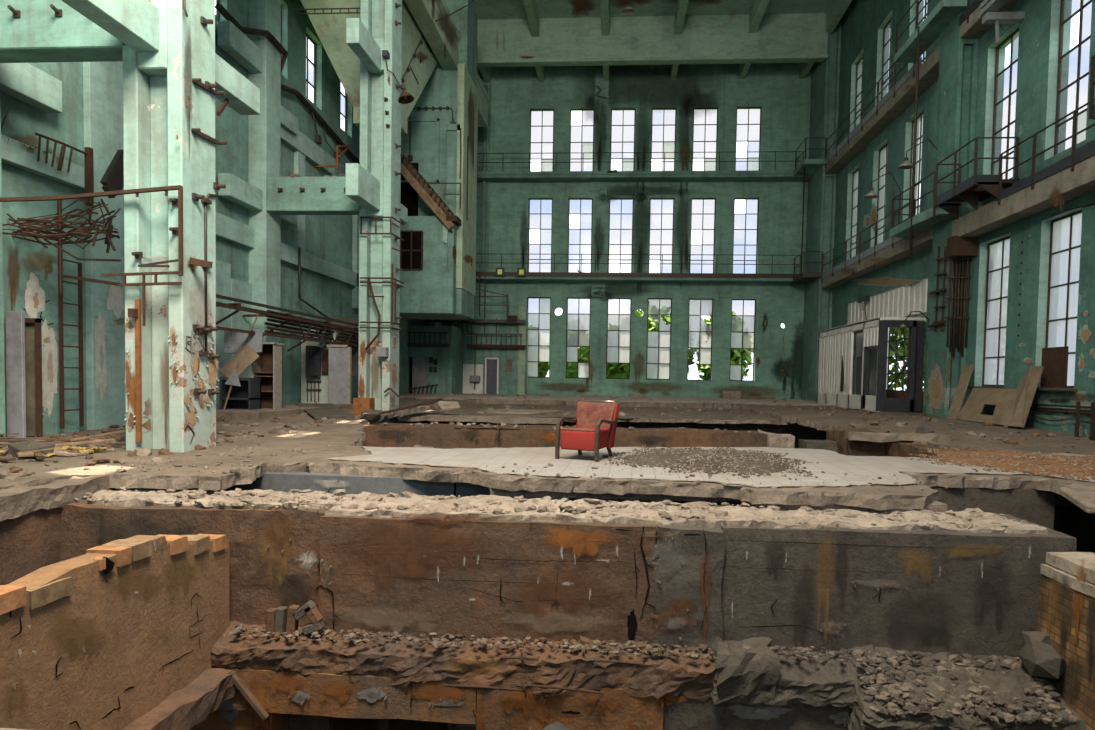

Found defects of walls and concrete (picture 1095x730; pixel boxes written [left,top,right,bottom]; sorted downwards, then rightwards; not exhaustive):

rust [570,0,592,14]
peeling [24,272,59,423]
peeling [168,326,219,431]
crack [315,526,655,630]
rust [548,529,612,557]
crack [159,592,204,675]